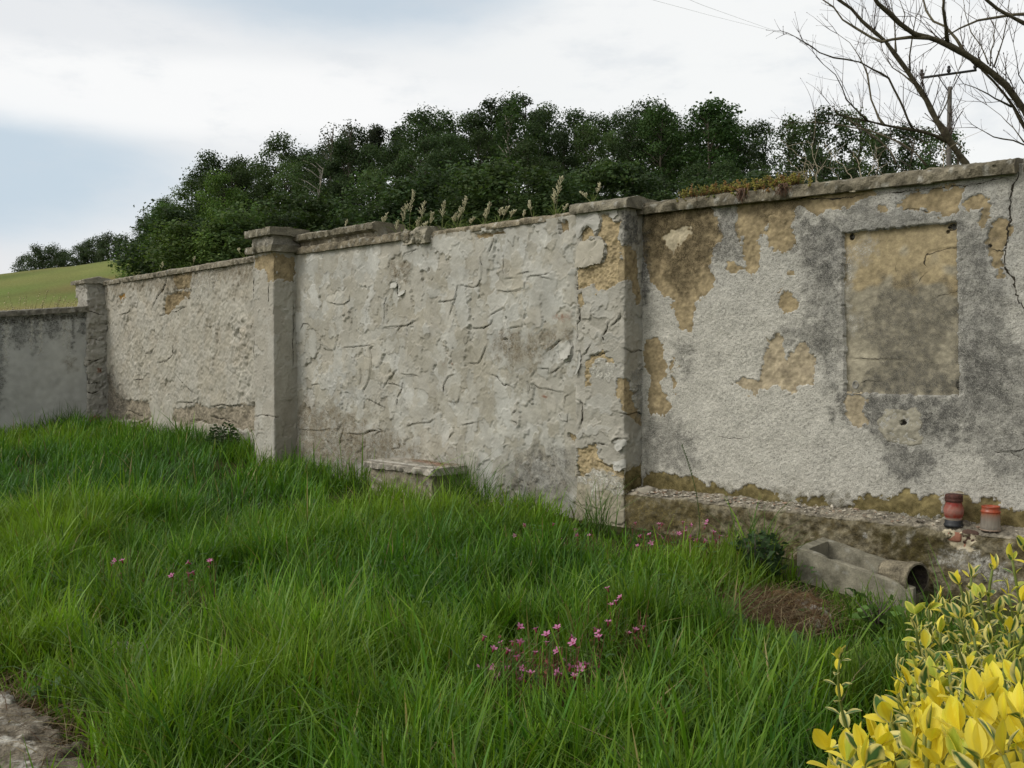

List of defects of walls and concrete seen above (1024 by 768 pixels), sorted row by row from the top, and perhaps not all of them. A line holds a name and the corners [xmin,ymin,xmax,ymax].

peeling [164,272,193,315]
crack [136,347,277,424]
peeling [254,253,296,282]
crack [301,285,429,449]
crack [444,240,642,424]
peeling [583,337,680,426]
spalling [732,333,816,397]
peeling [561,183,1014,332]
damp [757,198,872,370]
crack [784,167,1024,309]
damp [828,221,1024,483]
peeling [845,488,1024,552]